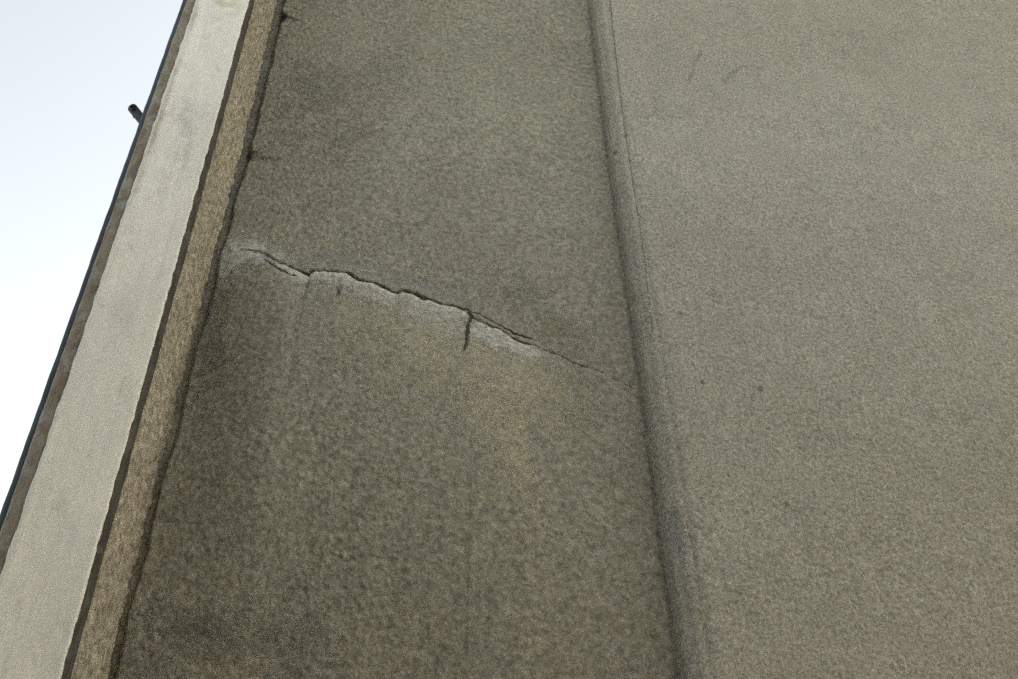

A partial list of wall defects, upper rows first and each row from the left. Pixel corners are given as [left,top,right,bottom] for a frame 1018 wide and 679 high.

crack [256,251,632,388]